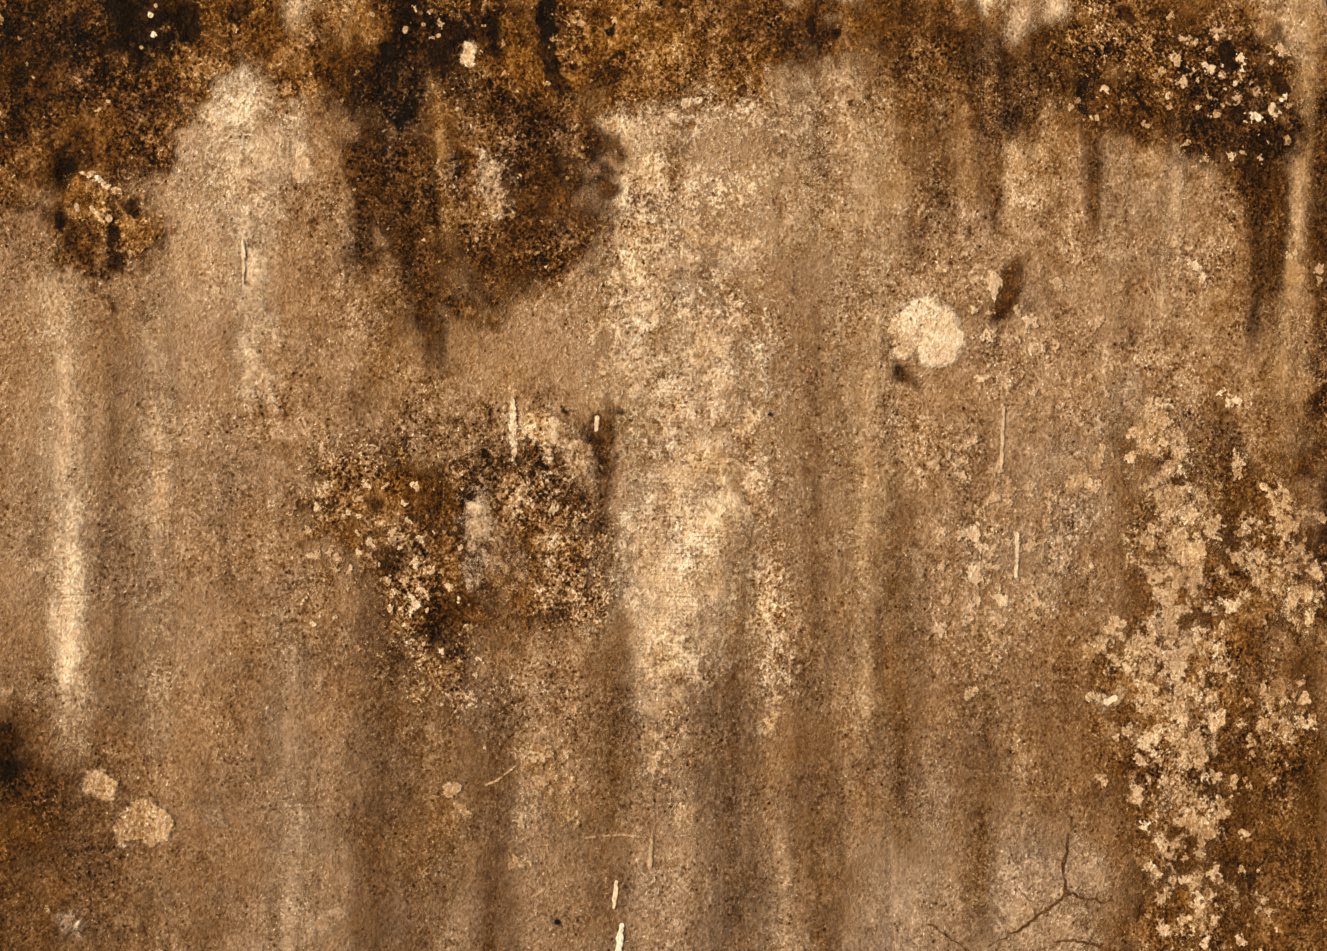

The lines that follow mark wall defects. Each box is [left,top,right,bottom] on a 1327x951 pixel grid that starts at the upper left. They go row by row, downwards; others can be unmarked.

leakage [0,262,112,748]
leakage [129,301,177,739]
peeling [268,430,661,718]
leakage [460,391,641,529]
leakage [851,342,916,946]
spalling [893,365,917,389]
leakage [987,253,1030,327]
peeling [925,363,1327,951]
leakage [1153,0,1327,377]
leakage [1295,486,1327,632]
leakage [697,688,842,951]
crack [928,813,1128,951]